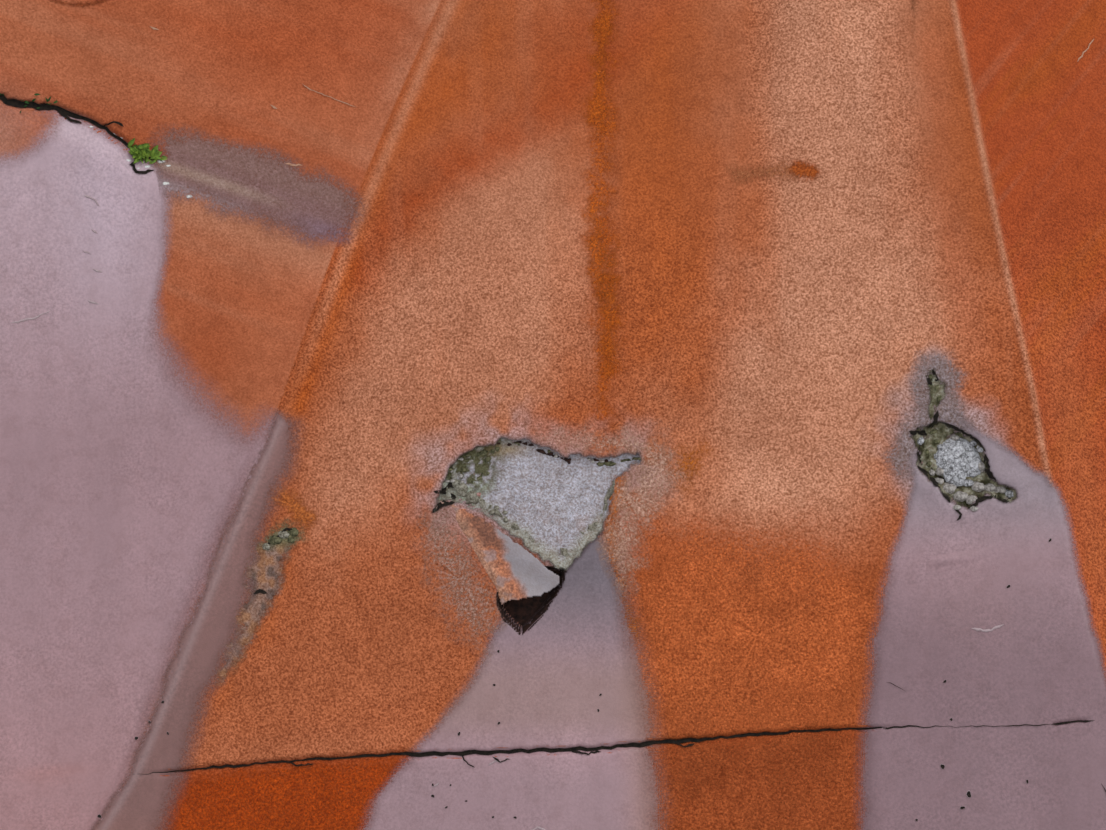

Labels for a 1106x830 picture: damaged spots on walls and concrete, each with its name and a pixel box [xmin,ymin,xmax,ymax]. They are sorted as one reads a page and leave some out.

crack [0,95,193,198]
leakage [0,116,361,830]
spalling [432,438,641,635]
spalling [909,369,1017,520]
crack [146,720,1095,775]